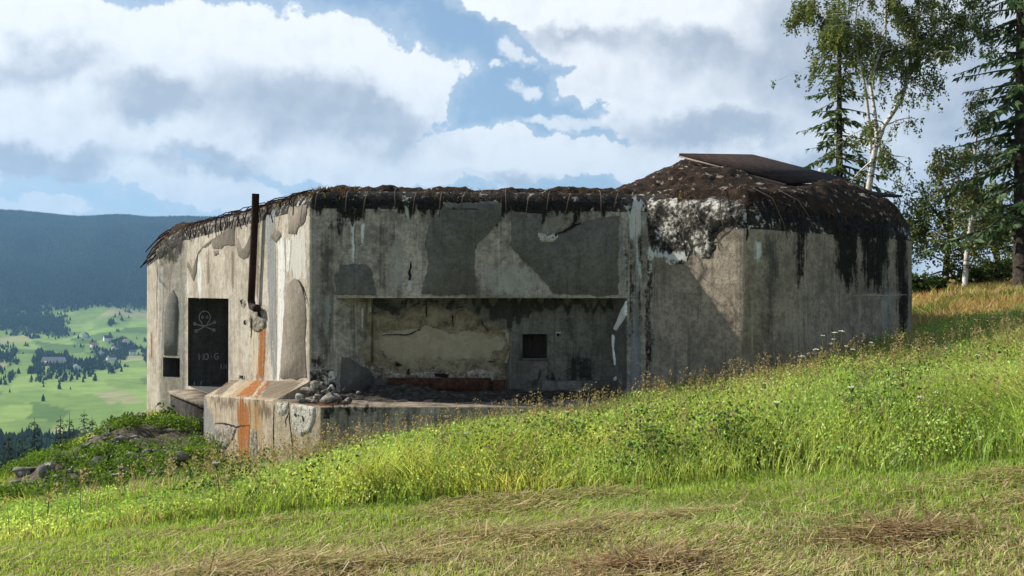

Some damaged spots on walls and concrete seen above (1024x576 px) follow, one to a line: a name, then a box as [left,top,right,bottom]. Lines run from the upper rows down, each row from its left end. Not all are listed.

flaking render [140,188,326,281]
flaking render [421,189,628,381]
damp [754,201,909,338]
rust [236,327,270,464]
crack [215,402,293,460]
flaking render [277,279,388,436]